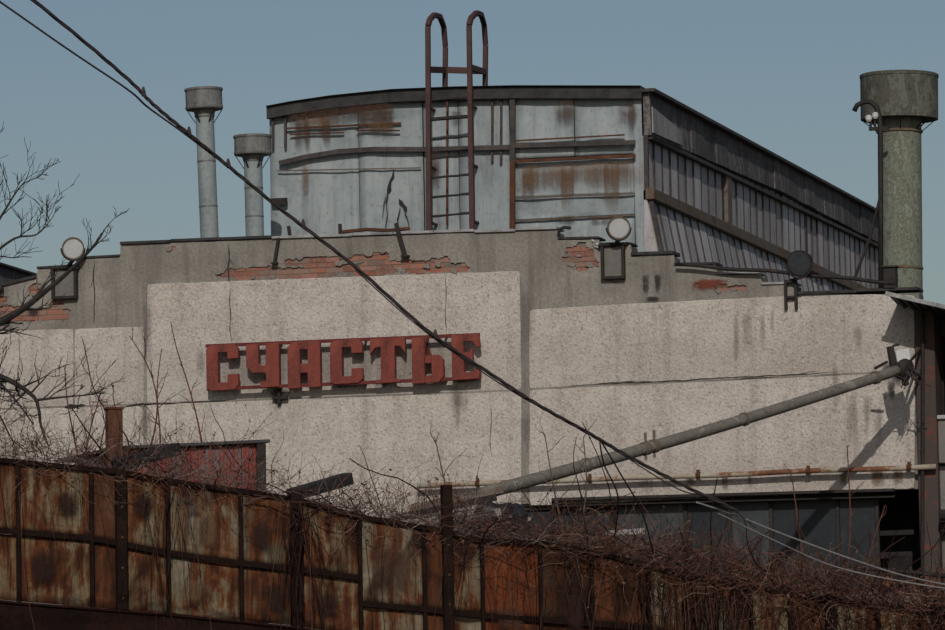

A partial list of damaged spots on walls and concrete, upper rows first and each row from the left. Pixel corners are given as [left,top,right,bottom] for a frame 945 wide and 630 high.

corrosion [292,104,391,141]
corrosion [523,163,630,192]
water stain [382,167,409,228]
flaking render [214,249,470,280]
flaking render [562,244,599,271]
flaking render [0,291,71,325]